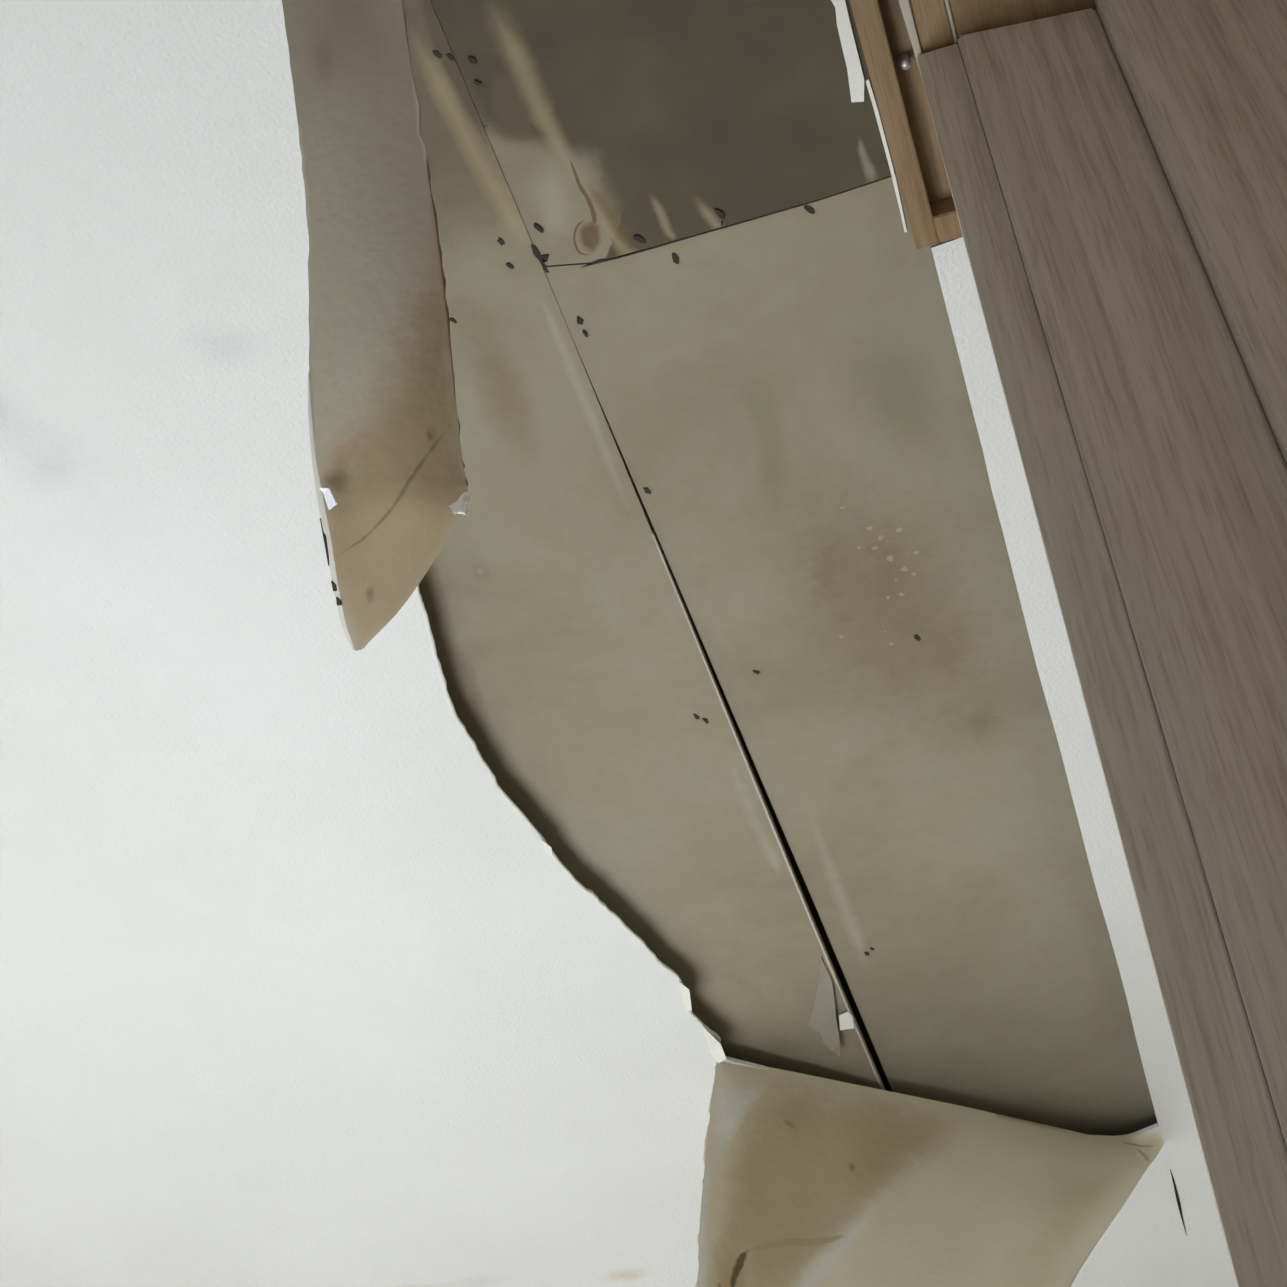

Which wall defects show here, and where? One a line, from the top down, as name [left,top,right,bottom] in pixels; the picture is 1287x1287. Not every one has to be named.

peeling [679,981,692,1011]
peeling [839,1011,854,1030]
peeling [703,1027,727,1063]